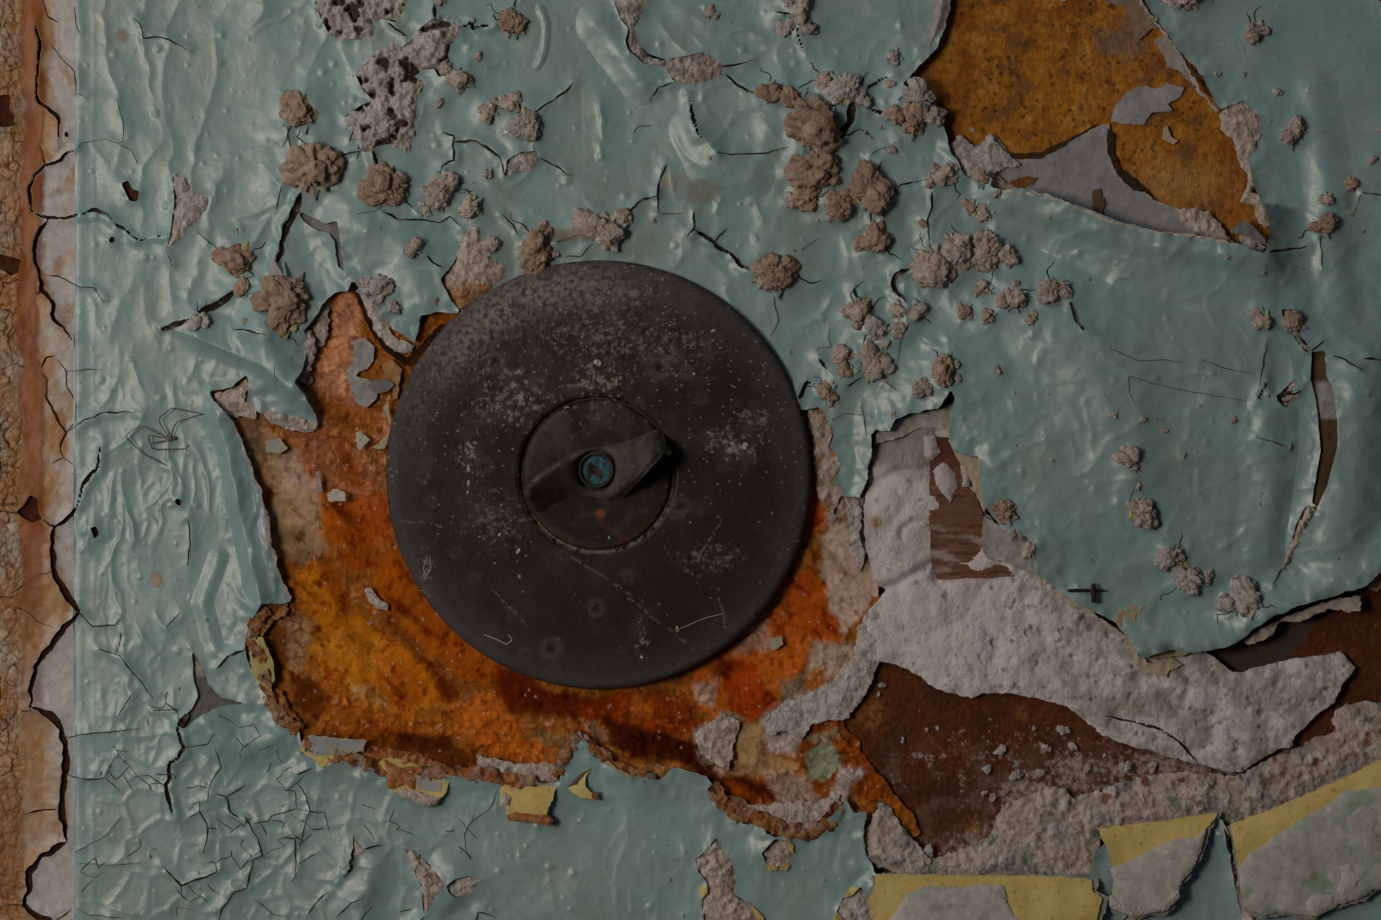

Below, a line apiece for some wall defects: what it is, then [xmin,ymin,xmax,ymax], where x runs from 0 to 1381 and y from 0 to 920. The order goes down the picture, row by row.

spalling [314,0,464,153]
crack [379,201,461,227]
crack [440,131,505,176]
crack [432,0,517,30]
crack [535,82,574,112]
peeling [904,0,1270,253]
rust [14,0,45,598]
crack [0,0,424,920]
spalling [211,226,1355,871]
peeling [1244,573,1381,645]
rust [843,586,1381,877]
peeling [834,759,1381,920]